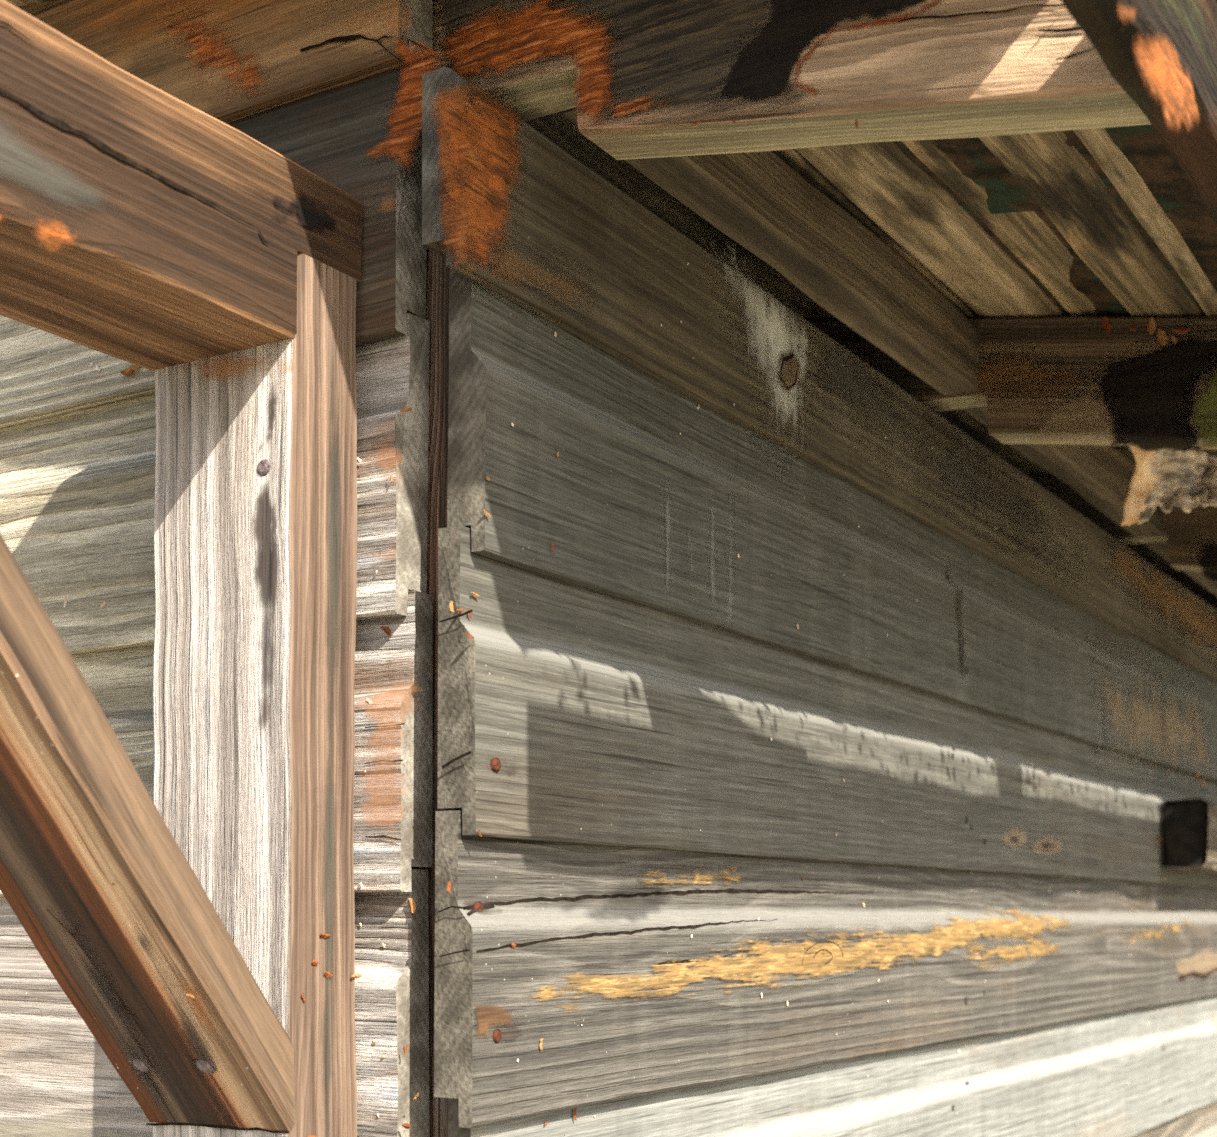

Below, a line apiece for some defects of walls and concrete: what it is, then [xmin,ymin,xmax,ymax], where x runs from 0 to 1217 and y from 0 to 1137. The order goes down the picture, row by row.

damp [255,485,278,723]
crack [438,889,874,957]
crack [659,951,746,964]
peeling [533,910,1070,1009]